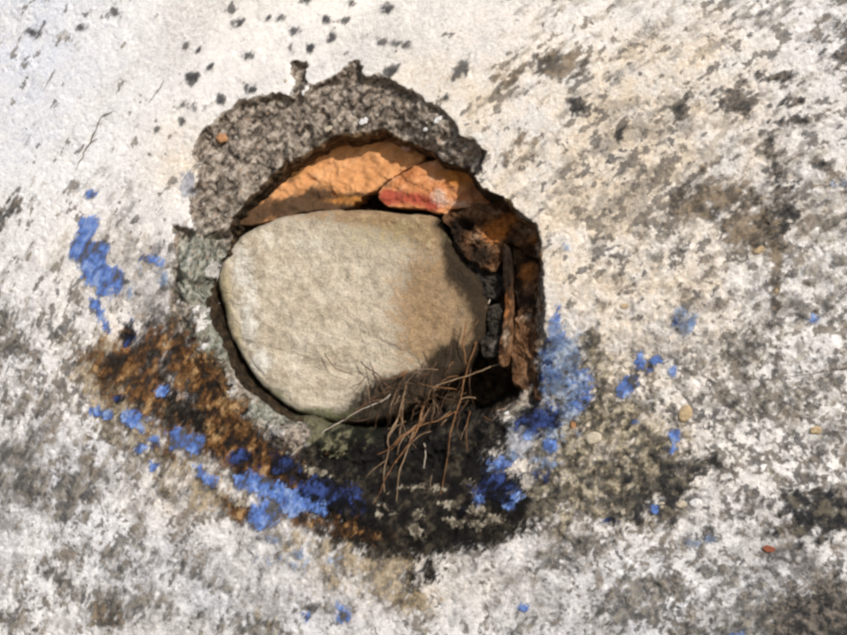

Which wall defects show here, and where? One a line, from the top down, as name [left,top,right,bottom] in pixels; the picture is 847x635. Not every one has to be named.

peeling [68,215,137,348]
spalling [138,60,597,543]
water stain [0,299,229,542]
peeling [89,394,219,498]
water stain [24,529,344,635]
rust [69,315,311,526]
rust [281,511,396,543]
water stain [190,349,847,635]
peeling [663,429,680,455]